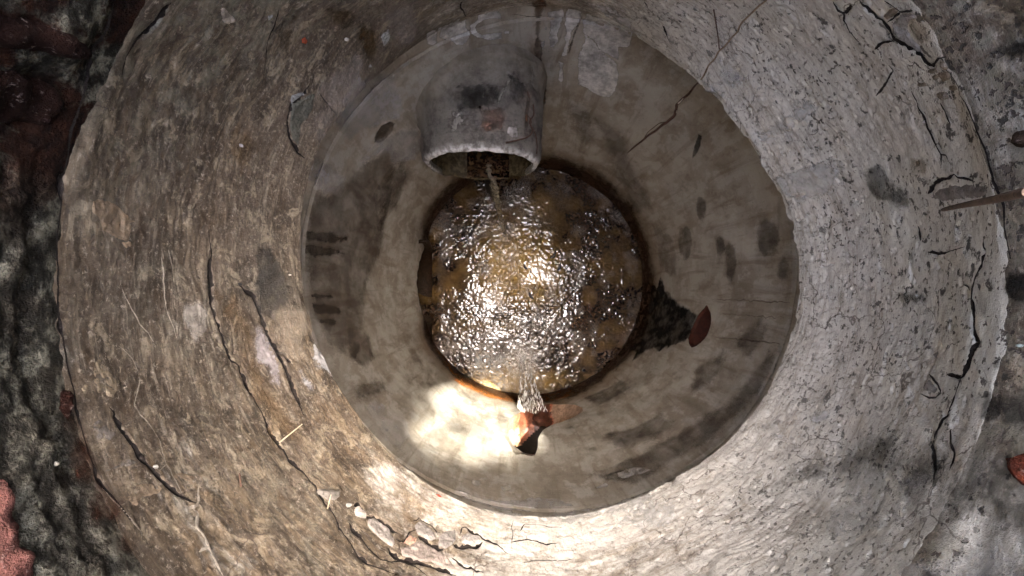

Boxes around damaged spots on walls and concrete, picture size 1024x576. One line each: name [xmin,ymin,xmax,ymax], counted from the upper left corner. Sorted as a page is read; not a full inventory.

crack [286,84,336,158]
damp [457,74,525,109]
crack [833,0,1011,483]
damp [422,156,696,404]
crack [207,231,571,576]
crack [109,346,223,576]
damp [597,455,659,488]
spalling [354,506,367,518]
peeling [438,530,480,549]